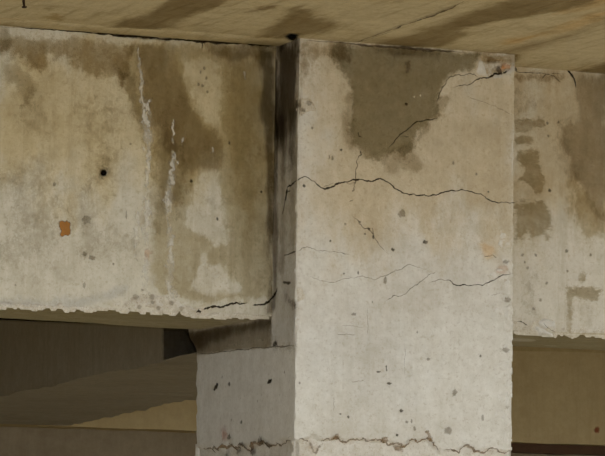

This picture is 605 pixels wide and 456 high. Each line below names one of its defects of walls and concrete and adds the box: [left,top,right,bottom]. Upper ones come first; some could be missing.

crack [437,67,576,100]
crack [282,151,514,214]
corrosion [59,221,71,237]
crack [386,264,508,301]
crack [196,290,277,313]